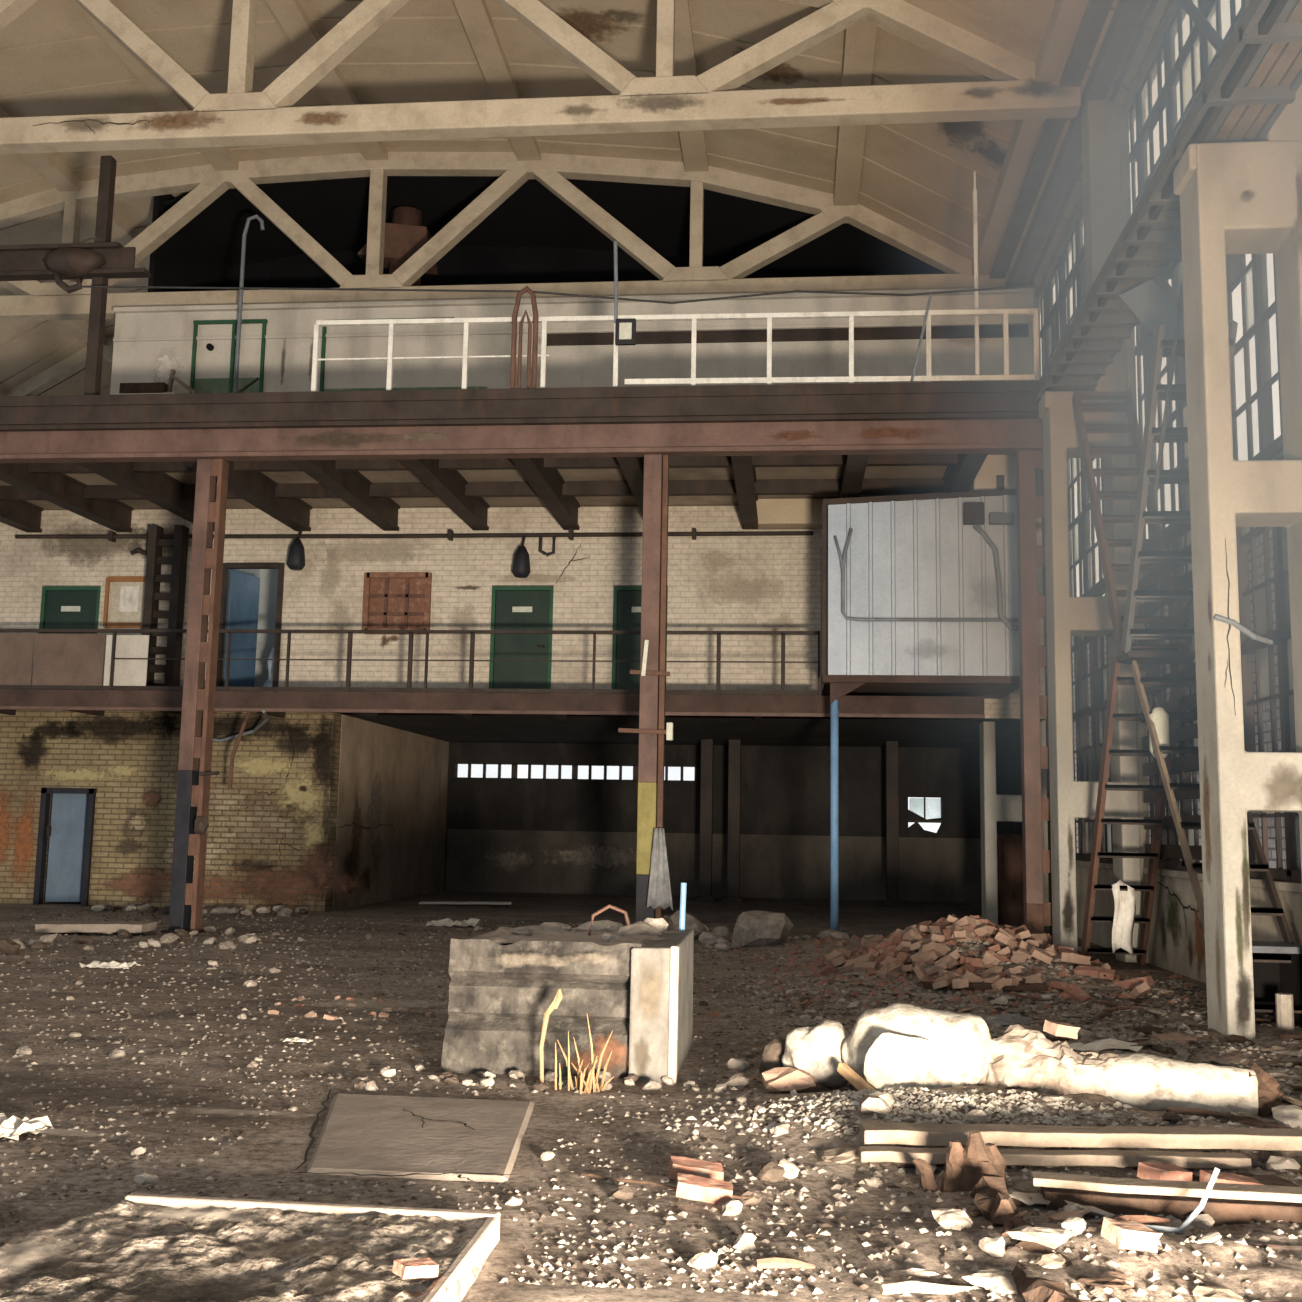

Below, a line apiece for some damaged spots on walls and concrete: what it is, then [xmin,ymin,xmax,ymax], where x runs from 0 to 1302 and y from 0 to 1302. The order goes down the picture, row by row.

peeling [120,789,162,853]
peeling [194,757,323,874]
water stain [1270,771,1300,807]
peeling [108,832,174,904]
water stain [1160,896,1181,949]
water stain [1237,975,1250,1026]